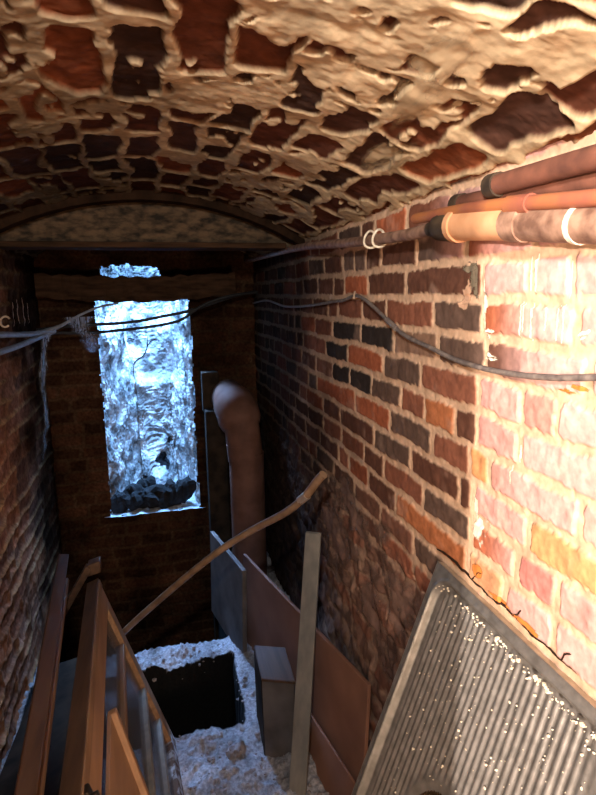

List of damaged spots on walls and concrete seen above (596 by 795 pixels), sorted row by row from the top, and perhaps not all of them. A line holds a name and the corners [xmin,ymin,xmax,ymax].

peeling [392,40,473,122]
peeling [365,143,408,171]
crack [436,548,577,674]